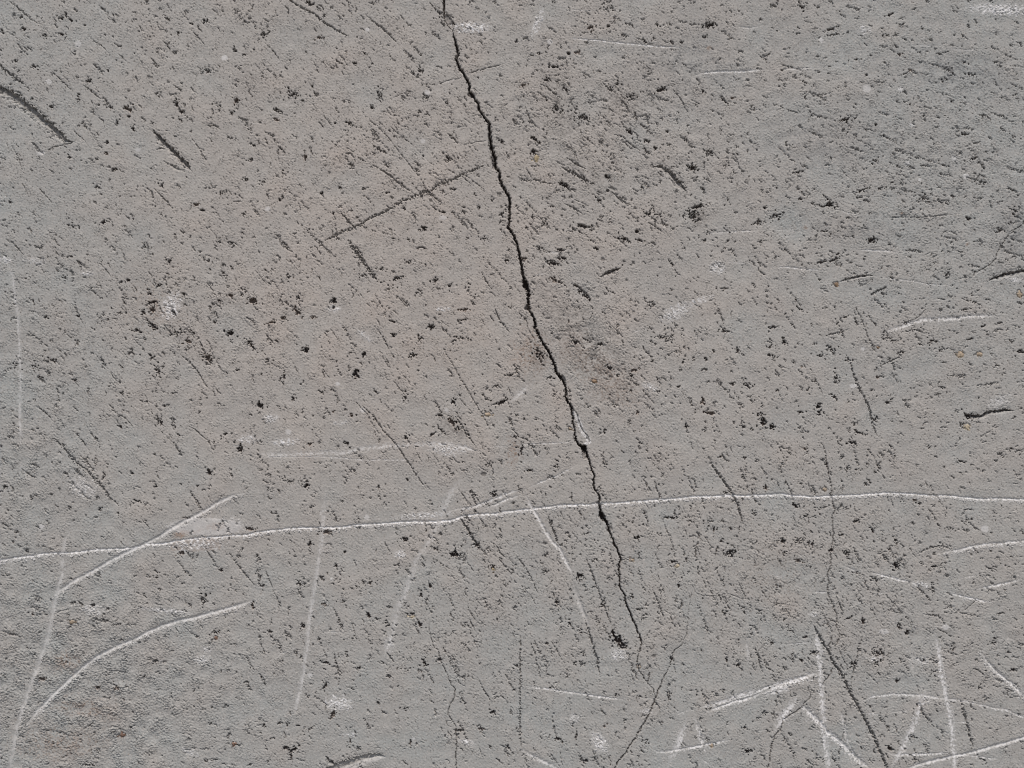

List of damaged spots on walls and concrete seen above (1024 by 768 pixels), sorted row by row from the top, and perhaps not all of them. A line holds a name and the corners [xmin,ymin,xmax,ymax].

crack [437,0,789,768]